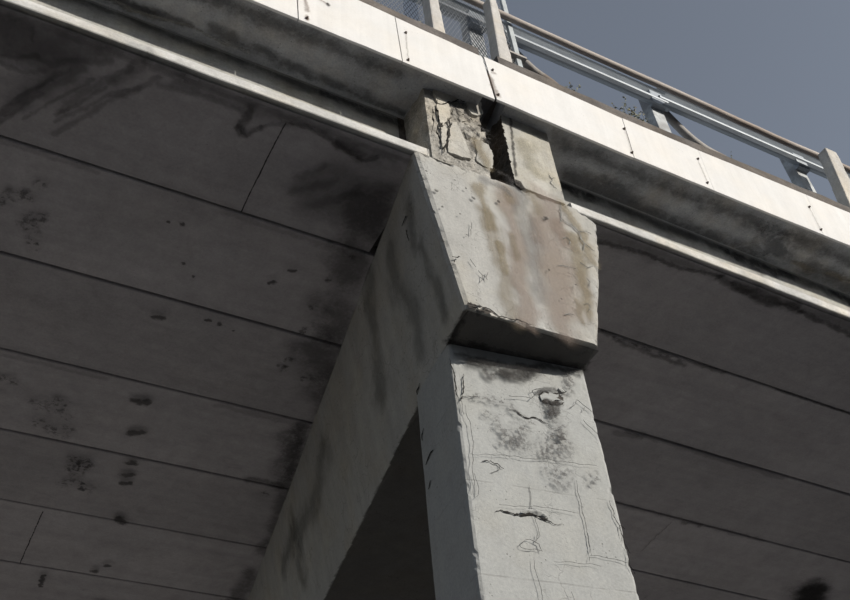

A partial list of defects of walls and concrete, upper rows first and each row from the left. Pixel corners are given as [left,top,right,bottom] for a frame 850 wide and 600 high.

crack [431,99,465,153]
spalling [433,90,525,190]
crack [449,358,504,498]
spalling [512,387,567,415]
crack [499,481,671,600]
damp [798,585,827,600]